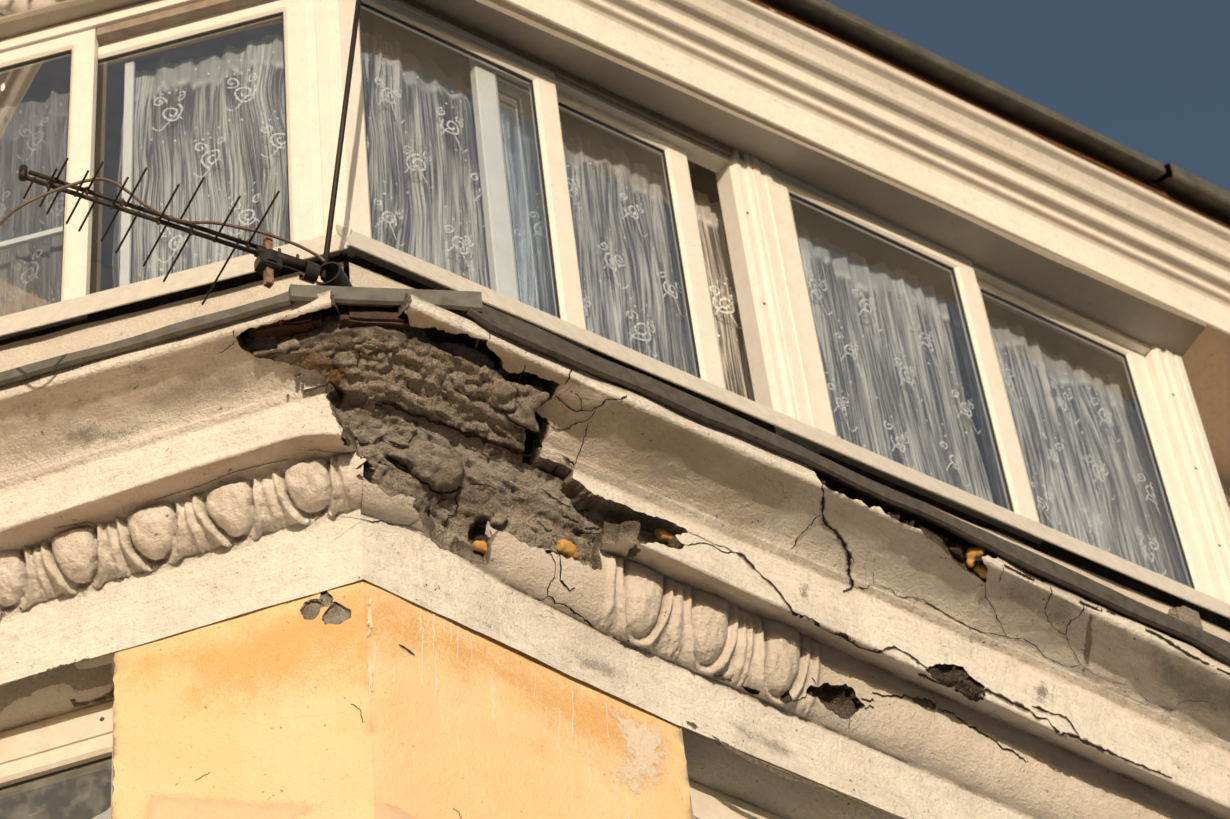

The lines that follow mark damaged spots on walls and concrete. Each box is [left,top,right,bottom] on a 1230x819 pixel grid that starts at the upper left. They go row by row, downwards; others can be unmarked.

spalling [236,291,688,570]
spalling [300,590,351,625]
crack [537,550,594,628]
crack [686,532,929,669]
crack [791,485,1206,710]
peeling [0,657,114,712]
spalling [806,682,865,719]
crack [849,692,910,726]
spalling [910,696,936,710]
spalling [918,663,986,702]
crack [938,708,1026,762]
crack [982,687,1172,779]